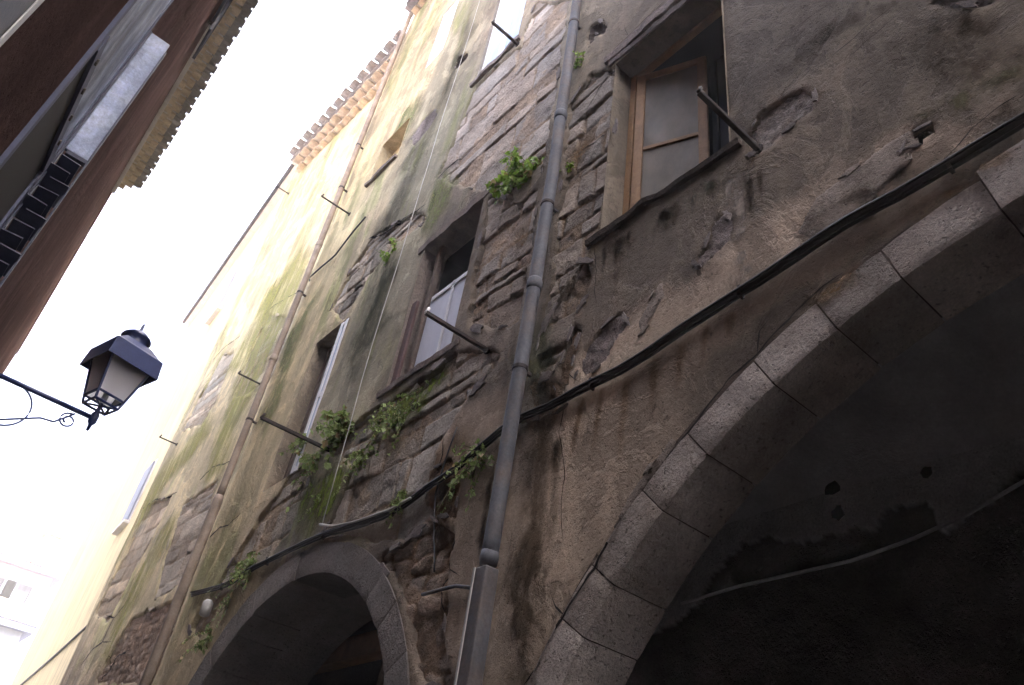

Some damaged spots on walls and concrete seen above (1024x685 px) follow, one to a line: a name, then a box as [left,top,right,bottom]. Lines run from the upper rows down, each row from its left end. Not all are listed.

flaking render [744,88,818,159]
peeling [798,121,933,238]
flaking render [329,214,426,320]
flaking render [530,70,664,421]
peeling [691,210,733,270]
flaking render [182,313,293,432]
flaking render [97,352,500,685]
water stain [510,343,560,658]